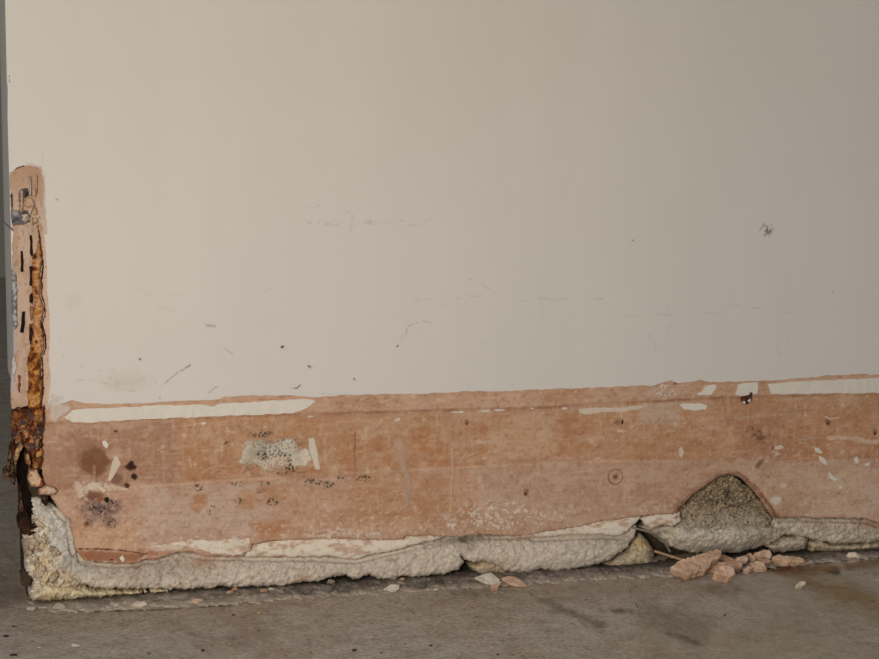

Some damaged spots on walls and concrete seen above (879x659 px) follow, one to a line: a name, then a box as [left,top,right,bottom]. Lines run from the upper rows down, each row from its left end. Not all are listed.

rust [18,239,44,415]
rust [24,448,57,506]
damp [246,430,301,485]
peeling [16,374,879,602]